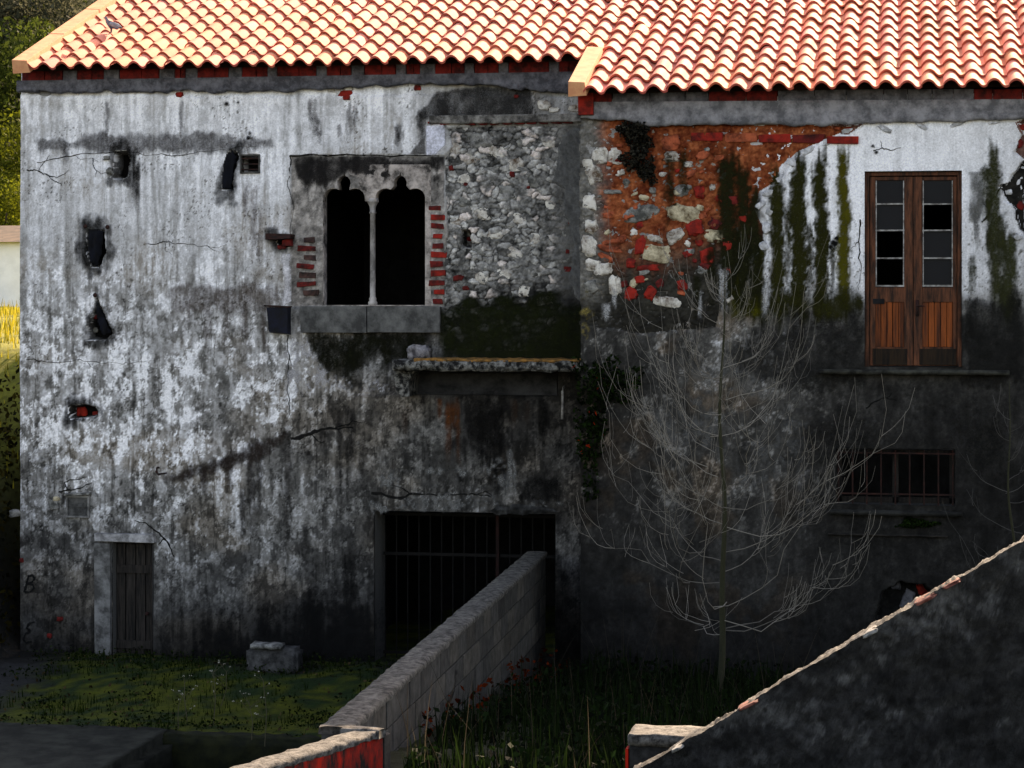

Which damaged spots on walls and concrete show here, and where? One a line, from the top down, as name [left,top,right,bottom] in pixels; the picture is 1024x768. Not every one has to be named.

hole [74,217,115,278]
hole [103,139,136,186]
crack [27,146,255,184]
damp [38,108,273,199]
spalling [426,118,863,341]
damp [969,173,983,238]
spalling [1000,119,1024,241]
hole [62,393,103,429]
crack [287,335,360,443]
crack [371,485,492,500]
crack [135,520,175,557]
damp [188,555,386,663]